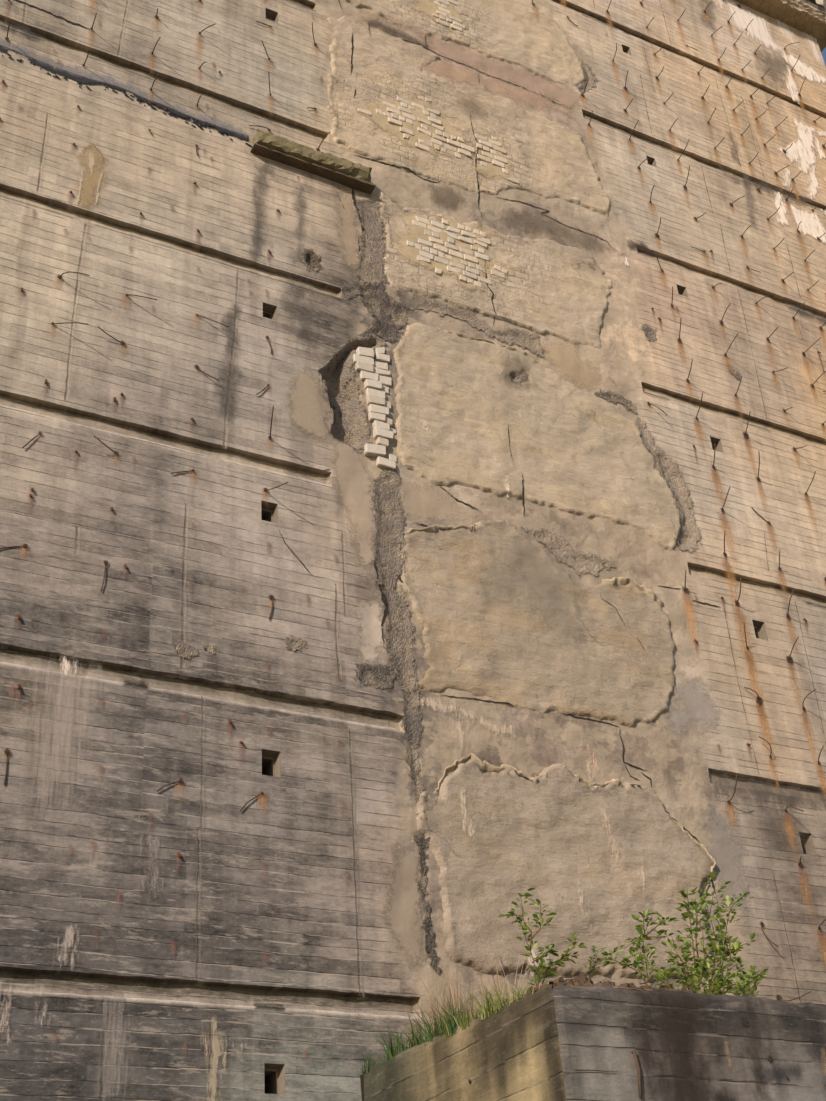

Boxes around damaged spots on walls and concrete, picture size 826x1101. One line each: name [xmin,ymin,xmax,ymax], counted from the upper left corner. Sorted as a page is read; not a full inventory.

leakage [0,24,246,136]
flaking render [357,95,520,184]
crack [350,23,571,109]
crack [470,116,613,248]
leakage [716,0,826,104]
leakage [773,119,826,243]
flaking render [321,197,545,454]
spalling [641,324,657,341]
spalling [595,389,702,553]
crack [373,549,403,647]
spalling [354,469,443,975]
crack [563,713,699,842]